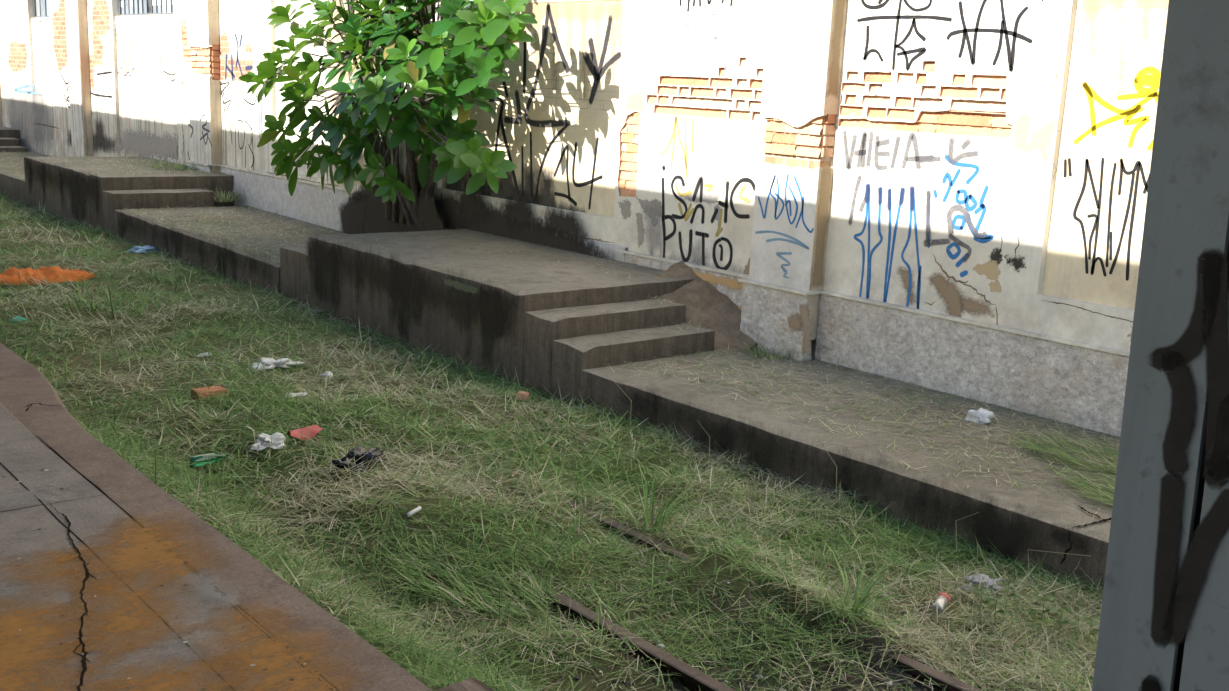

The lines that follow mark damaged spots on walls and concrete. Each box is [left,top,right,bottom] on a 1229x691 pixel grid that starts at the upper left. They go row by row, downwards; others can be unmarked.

peeling [7,40,28,73]
peeling [52,0,68,72]
peeling [87,0,110,91]
spalling [181,19,254,82]
spalling [618,58,1056,247]
water stain [899,268,915,304]
water stain [930,274,991,317]
crack [47,501,95,691]